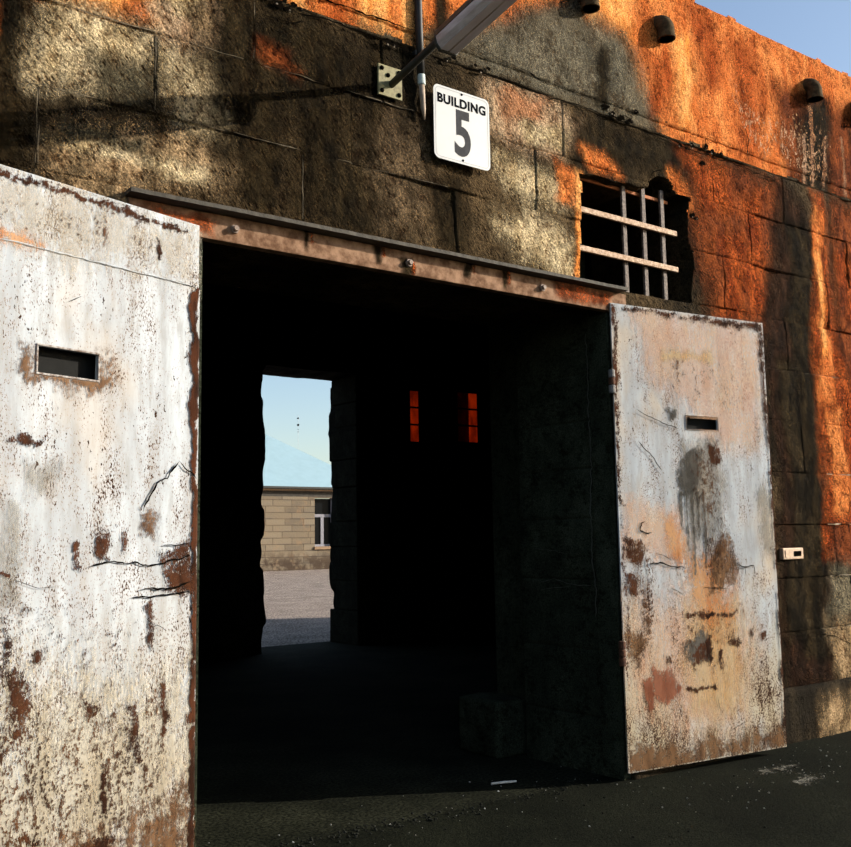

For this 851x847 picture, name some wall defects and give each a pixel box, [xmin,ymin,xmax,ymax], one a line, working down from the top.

rust [78,0,160,26]
rust [290,0,467,46]
rust [501,0,534,18]
leakage [794,98,851,199]
rust [0,168,210,233]
rust [0,227,44,247]
rust [558,0,851,711]
leakage [763,188,851,687]
crack [143,462,196,511]
rust [0,287,200,847]
crack [90,554,191,567]
rust [629,588,787,772]